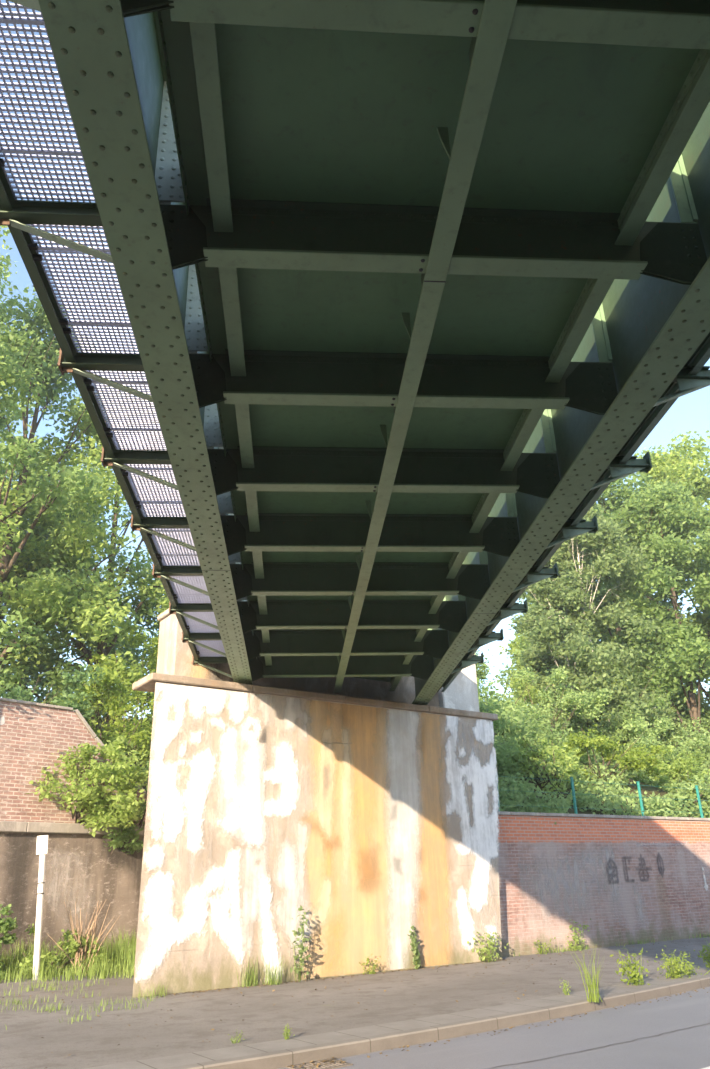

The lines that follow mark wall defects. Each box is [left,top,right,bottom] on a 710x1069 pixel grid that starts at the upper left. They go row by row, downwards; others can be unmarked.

corrosion [303,700,390,979]
corrosion [420,713,449,967]